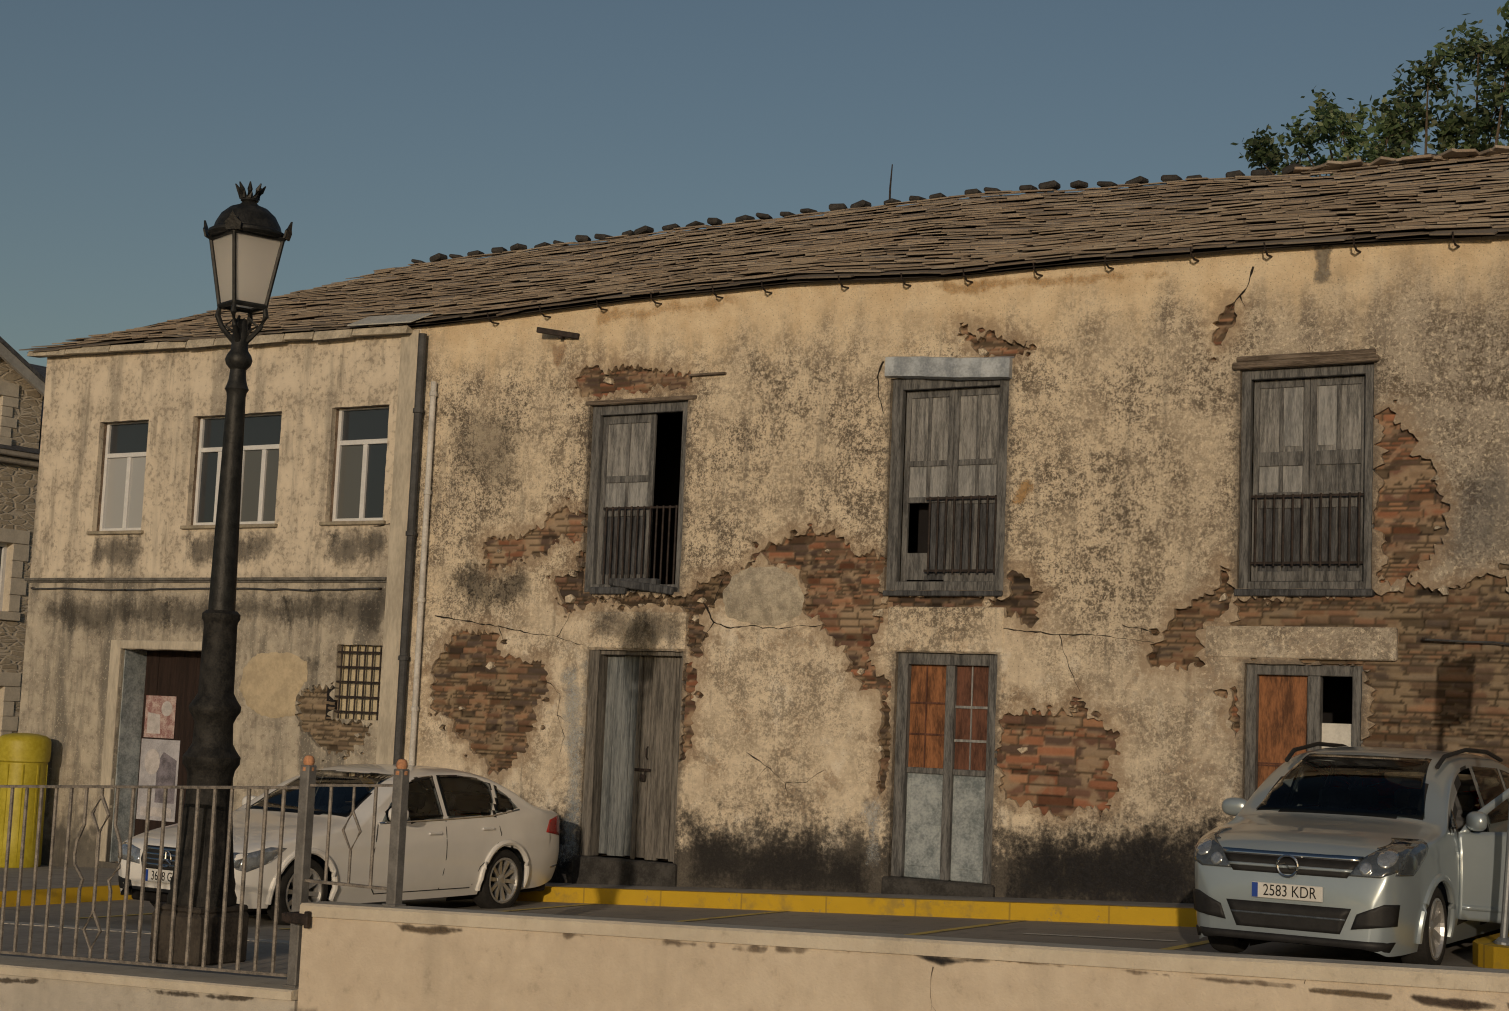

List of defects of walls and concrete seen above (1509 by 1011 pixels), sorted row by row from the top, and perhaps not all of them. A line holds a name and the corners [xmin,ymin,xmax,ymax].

flaking render [577,366,693,400]
flaking render [956,326,1037,358]
flaking render [1209,304,1237,360]
flaking render [484,498,1044,793]
flaking render [1149,400,1509,792]
peeling [239,652,373,759]
flaking render [427,630,550,775]
flaking render [997,697,1125,821]
leakage [694,824,863,891]
leakage [1006,819,1212,903]